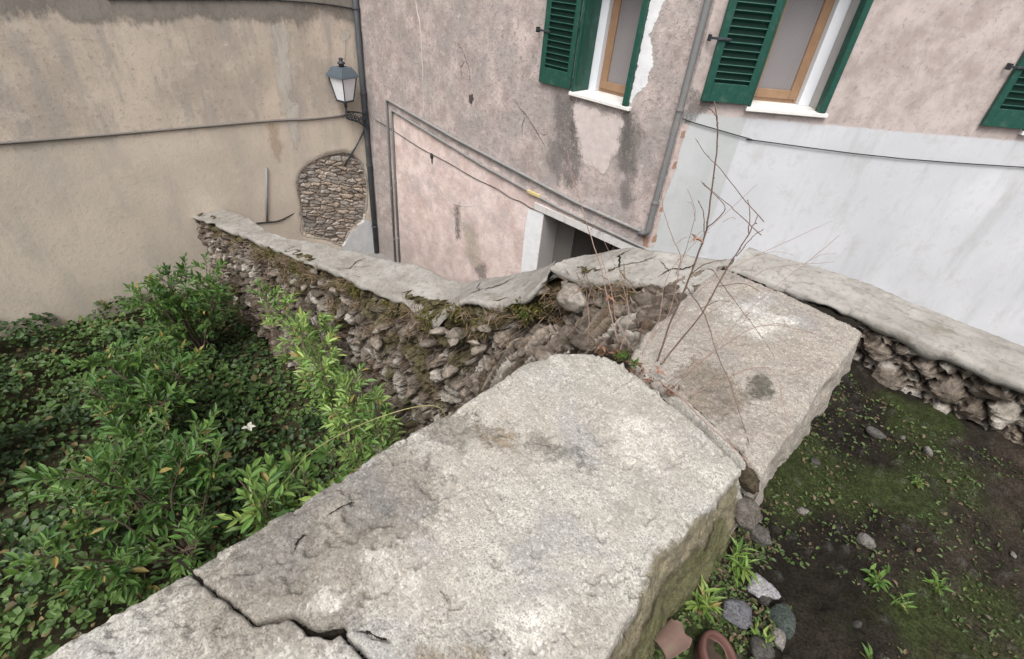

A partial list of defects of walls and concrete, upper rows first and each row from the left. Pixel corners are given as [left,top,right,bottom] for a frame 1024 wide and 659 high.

spalling [296,151,368,247]
water stain [547,95,581,187]
water stain [618,112,642,206]
crack [606,248,693,275]
crack [175,558,389,659]